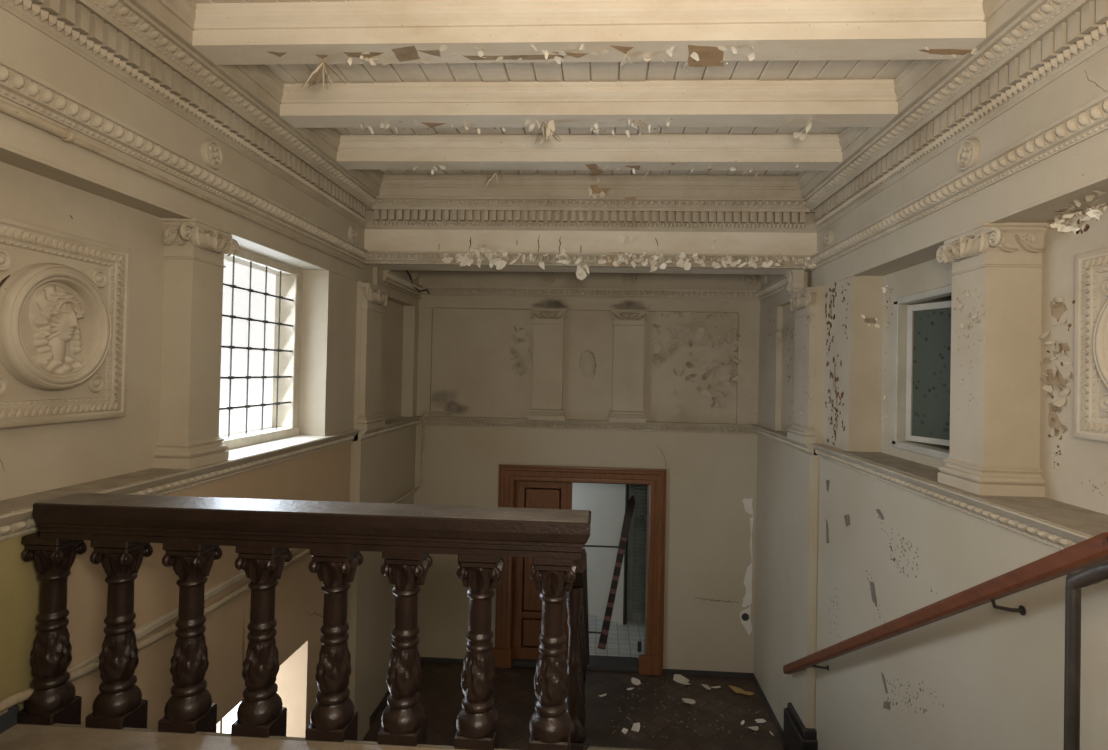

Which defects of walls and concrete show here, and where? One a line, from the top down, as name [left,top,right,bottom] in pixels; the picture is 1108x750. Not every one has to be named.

peeling [343,44,674,66]
peeling [683,45,755,70]
spalling [1045,191,1108,234]
peeling [442,243,818,280]
peeling [823,277,850,446]
peeling [1039,297,1075,468]
spalling [740,498,754,635]
spalling [875,509,919,578]
spalling [865,570,885,623]
spalling [881,672,944,714]